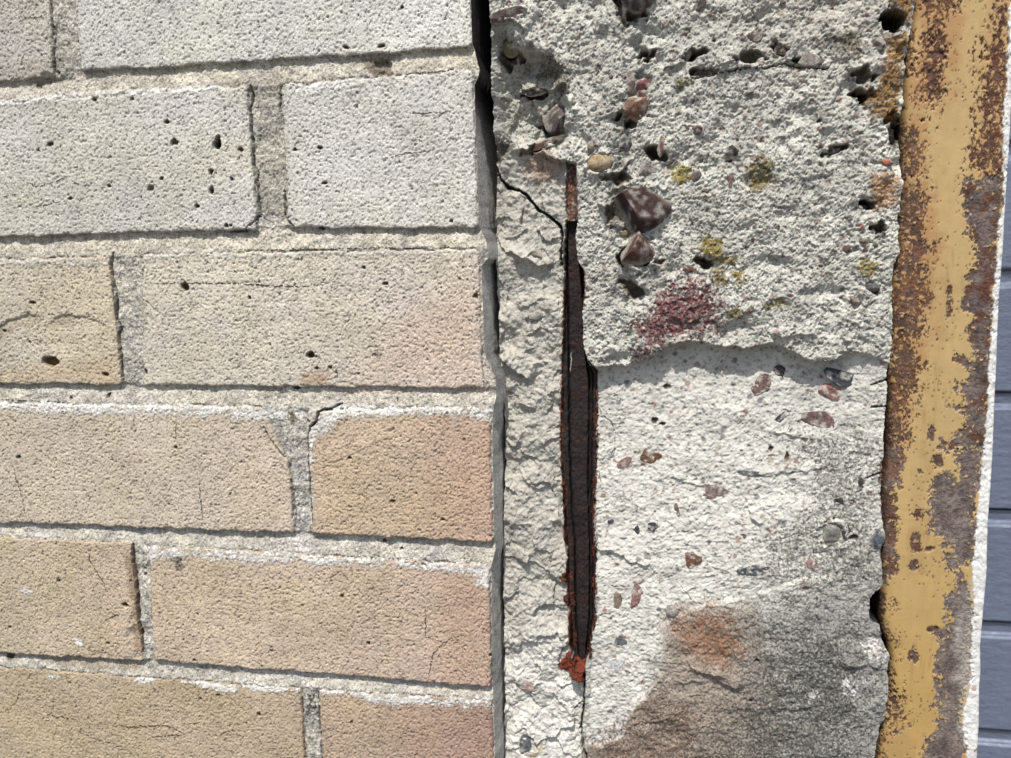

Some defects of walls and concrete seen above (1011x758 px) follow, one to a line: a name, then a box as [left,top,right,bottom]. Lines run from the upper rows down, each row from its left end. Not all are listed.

rust [862,0,912,123]
crack [500,175,564,261]
rust [523,150,582,222]
rust [865,169,902,212]
spalling [490,0,1010,758]
rust [558,284,600,683]
leakage [591,422,889,758]
crack [555,676,588,755]